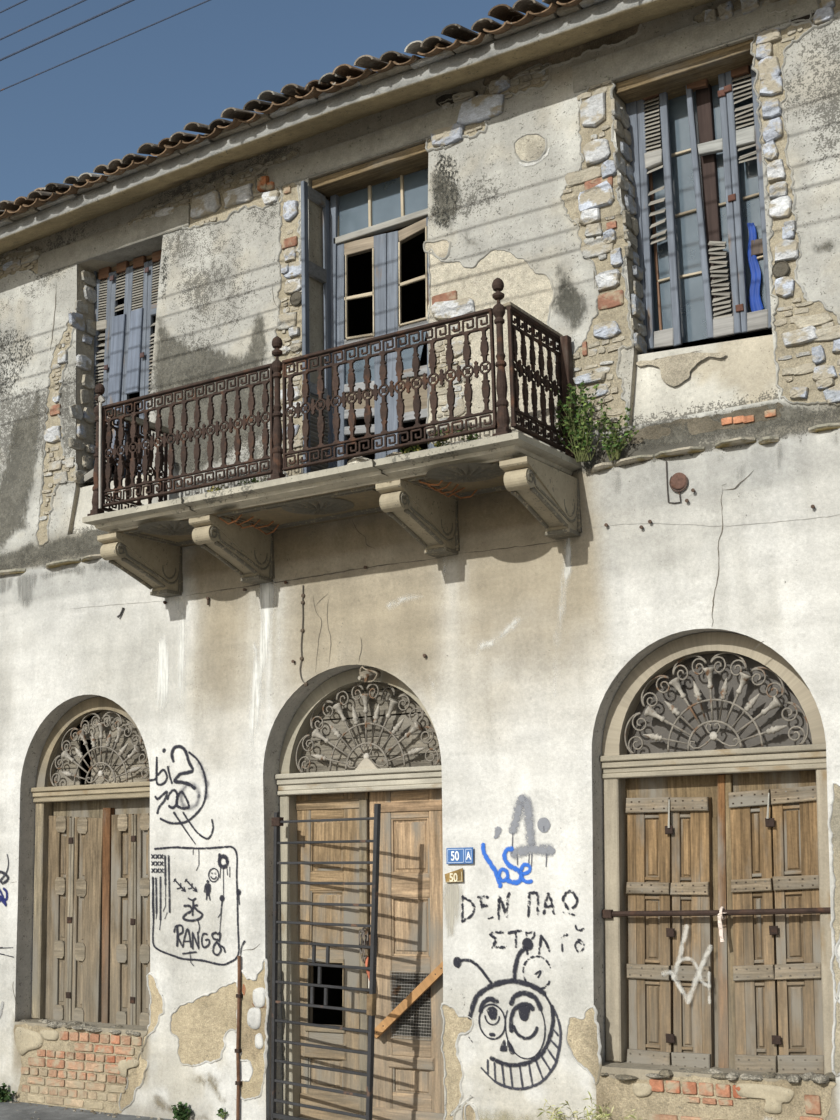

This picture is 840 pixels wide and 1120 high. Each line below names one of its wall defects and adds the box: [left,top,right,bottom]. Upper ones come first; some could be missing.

water stain [432,174,458,225]
flaking render [423,239,560,445]
flaking render [559,184,600,358]
flaking render [577,87,589,170]
flaking render [586,0,840,444]
water stain [0,396,117,604]
crack [600,470,840,625]
flaking render [13,958,269,1114]
flaking render [565,782,840,1120]